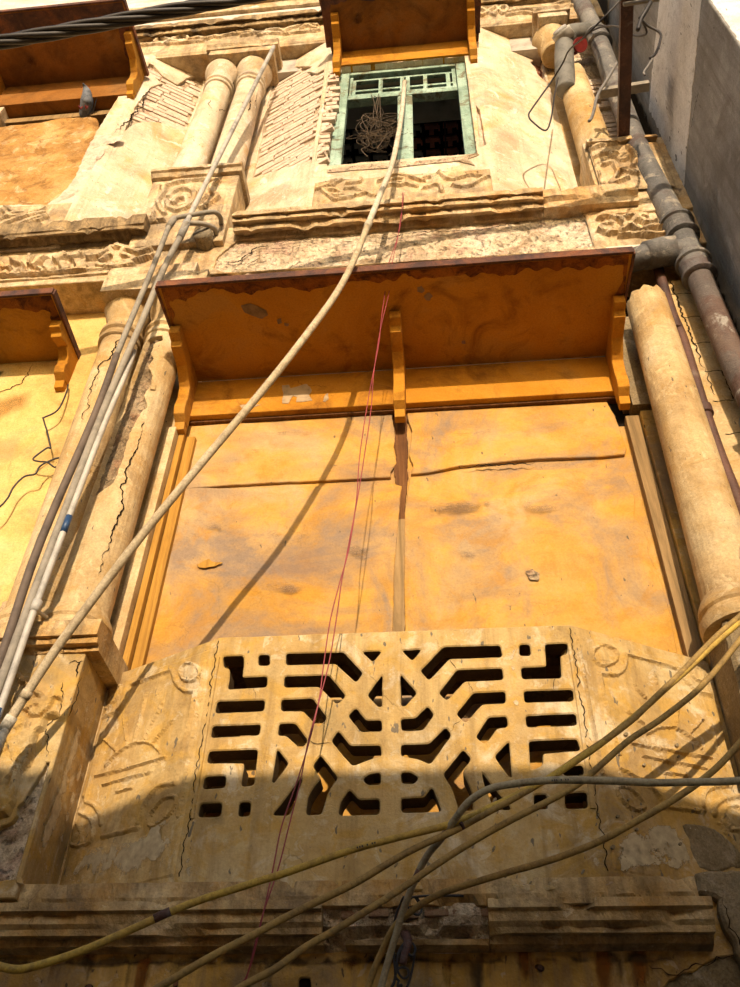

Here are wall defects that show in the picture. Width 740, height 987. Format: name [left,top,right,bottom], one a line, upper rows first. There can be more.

crack [114,89,150,133]
crack [81,334,122,420]
crack [669,278,715,395]
crack [100,423,144,572]
spalling [0,764,49,885]
peeling [42,729,81,847]
peeling [619,824,740,871]
spalling [665,956,740,987]